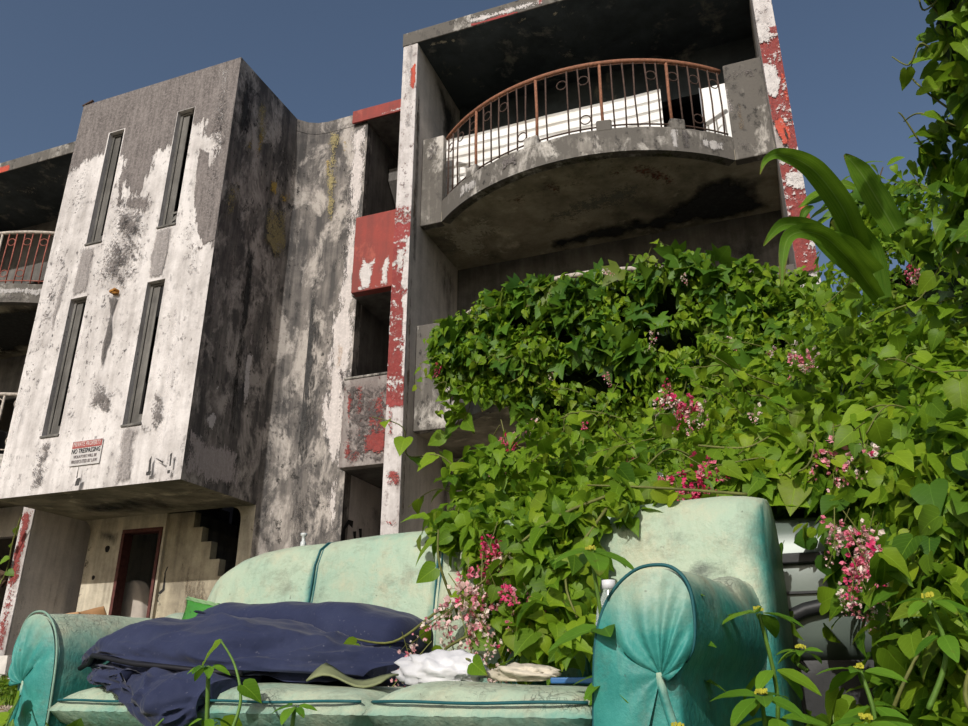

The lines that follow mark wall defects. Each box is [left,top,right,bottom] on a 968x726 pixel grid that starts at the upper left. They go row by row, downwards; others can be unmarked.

water stain [239,81,253,131]
peeling [755,3,798,150]
peeling [764,160,810,219]
peeling [793,238,819,271]
water stain [90,380,114,411]
water stain [229,247,254,432]
water stain [297,279,324,463]
peeling [344,205,411,463]
water stain [291,494,309,547]
peeling [0,570,20,650]